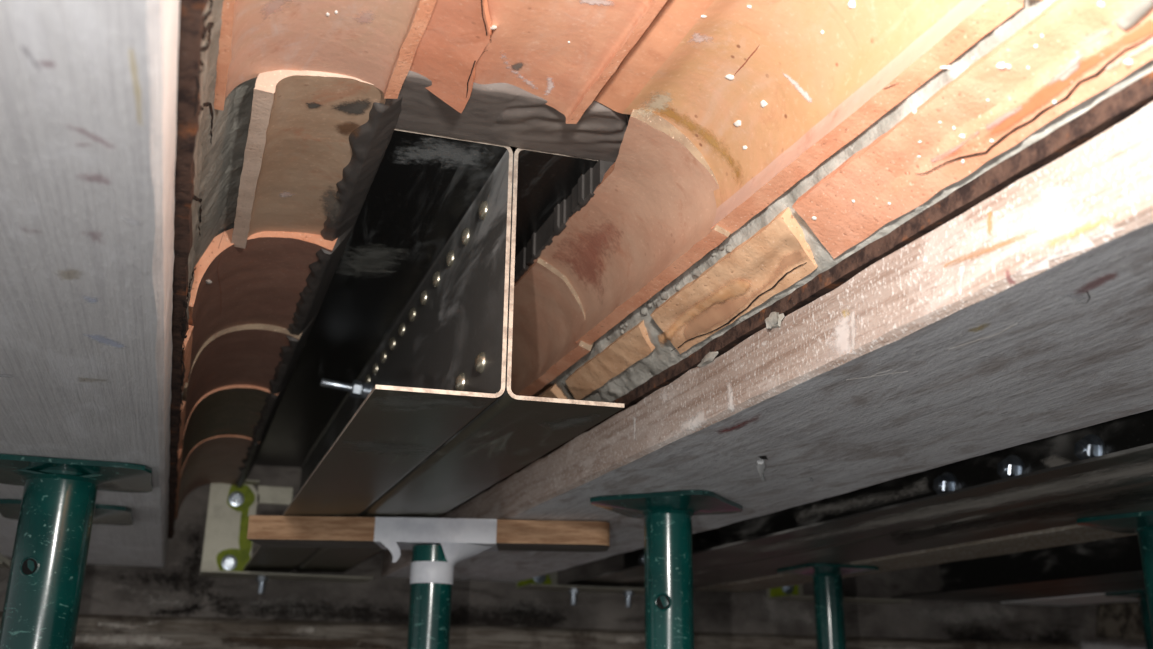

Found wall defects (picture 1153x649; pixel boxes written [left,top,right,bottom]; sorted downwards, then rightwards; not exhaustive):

crack [466,0,491,98]
crack [915,35,1153,174]
crack [673,258,815,350]